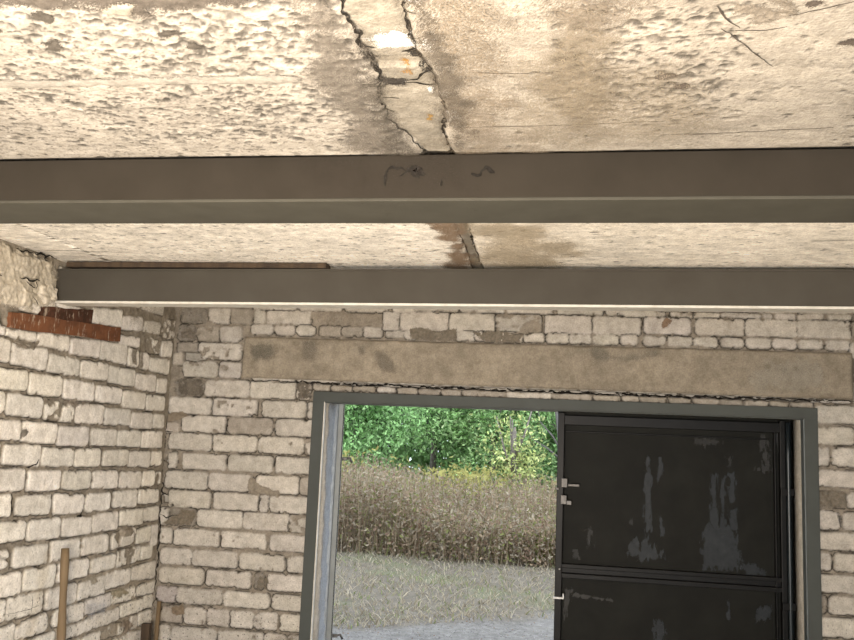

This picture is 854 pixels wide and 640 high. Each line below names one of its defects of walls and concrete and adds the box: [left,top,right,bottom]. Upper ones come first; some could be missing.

crack [340,0,459,151]
water stain [266,0,737,156]
crack [0,248,69,304]
water stain [423,223,594,269]